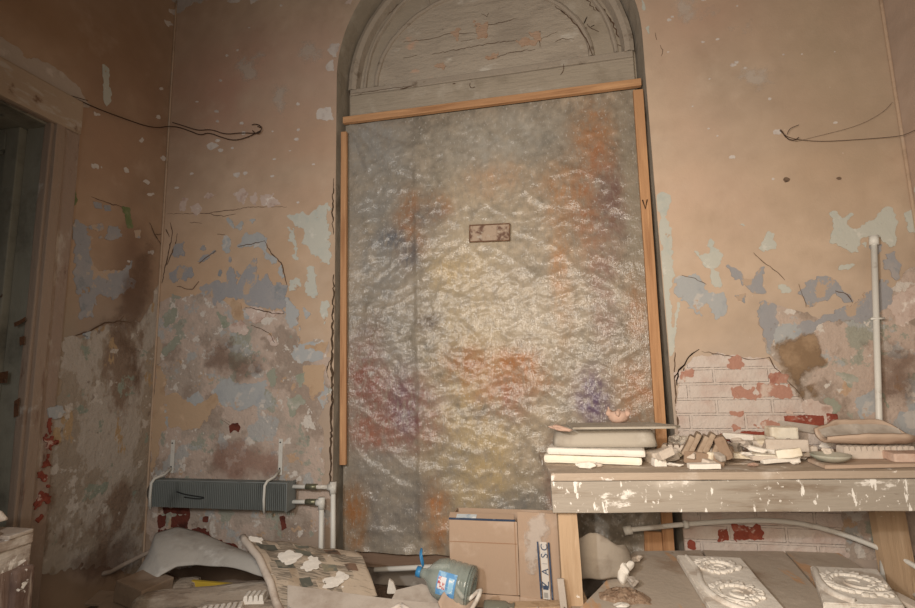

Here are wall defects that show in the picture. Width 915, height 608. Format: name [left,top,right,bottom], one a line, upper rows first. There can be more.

crack [404,0,621,58]
peeling [0,37,112,116]
flaking render [656,192,915,449]
flaking render [33,178,335,575]
crack [674,349,804,401]
leakage [774,334,827,398]
flaking render [682,511,877,561]
flaking render [905,511,915,556]